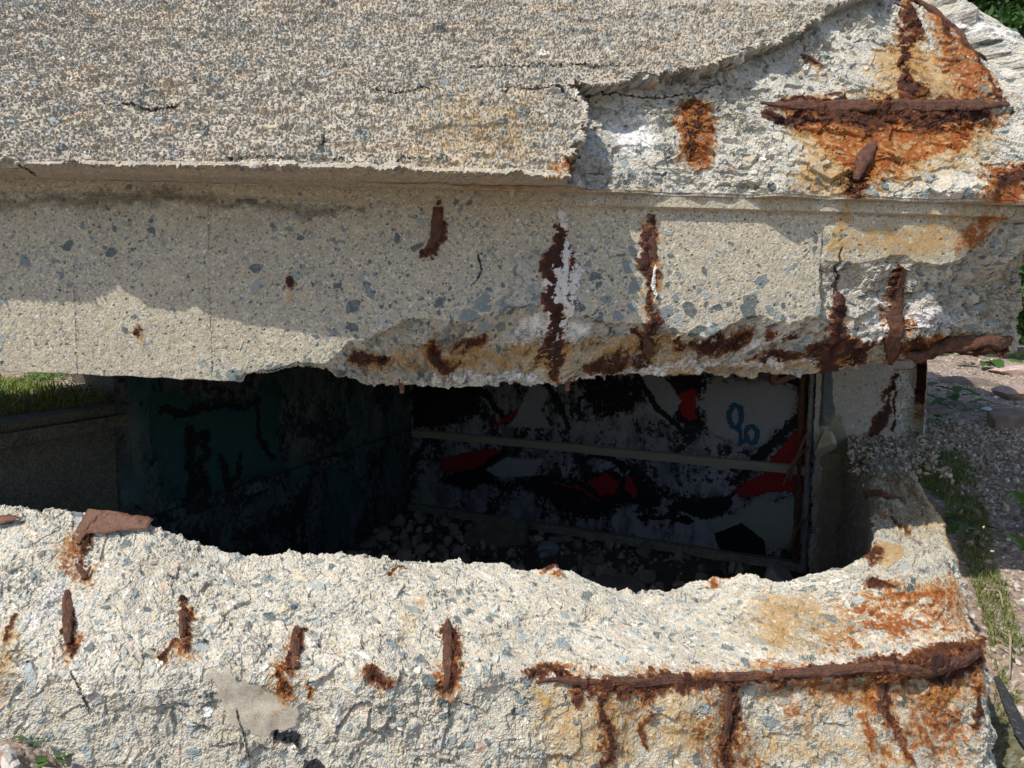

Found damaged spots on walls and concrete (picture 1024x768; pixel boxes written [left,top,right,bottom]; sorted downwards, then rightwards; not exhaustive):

crack [104,101,179,112]
crack [470,61,718,102]
rust [672,95,717,172]
rust [887,0,932,100]
spalling [235,0,1024,436]
rust [974,160,1024,204]
rust [533,209,876,387]
rust [422,333,491,378]
rust [76,533,95,567]
rust [732,512,978,659]
rust [536,683,724,768]
rust [885,678,985,768]